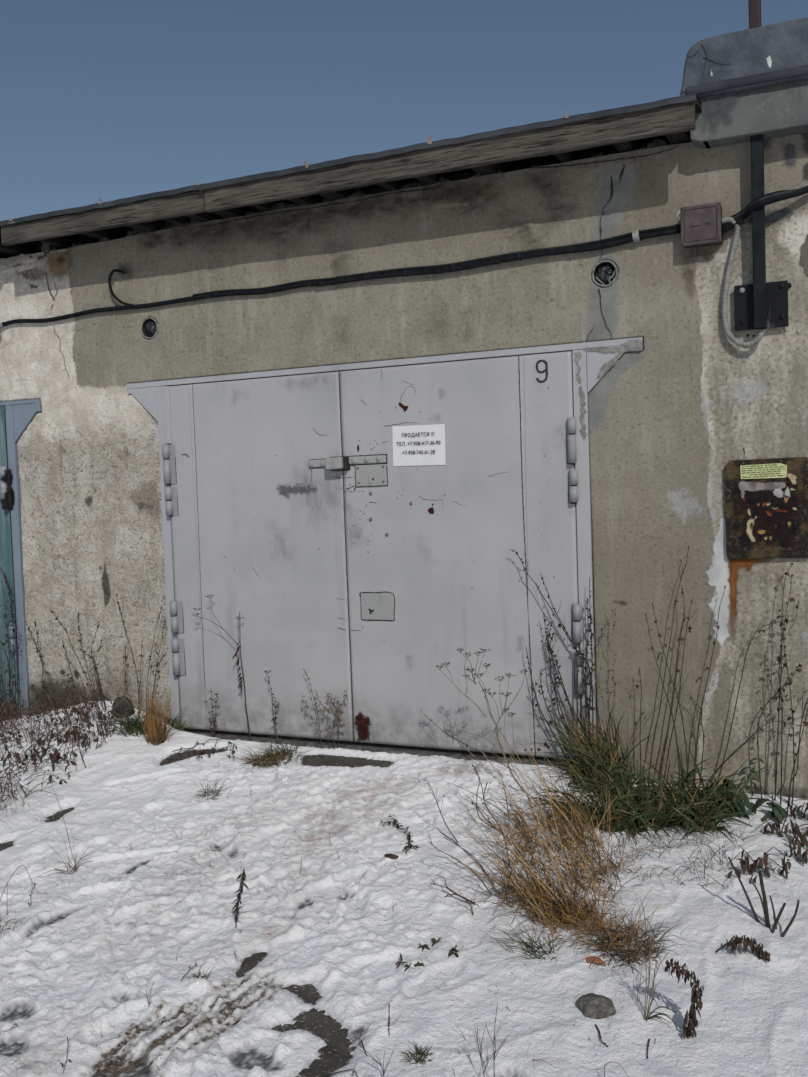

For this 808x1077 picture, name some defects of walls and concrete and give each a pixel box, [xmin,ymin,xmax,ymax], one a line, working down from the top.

crack [536,145,679,258]
peeling [799,234,808,276]
crack [586,289,612,342]
peeling [669,473,731,646]
rust [729,558,769,638]
peeling [705,668,721,704]
rust [355,712,371,741]